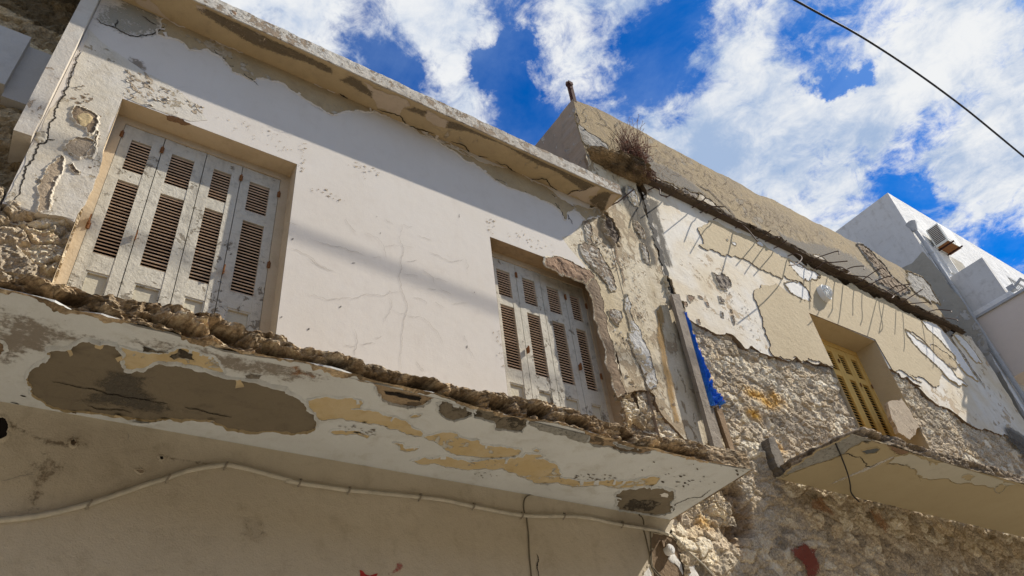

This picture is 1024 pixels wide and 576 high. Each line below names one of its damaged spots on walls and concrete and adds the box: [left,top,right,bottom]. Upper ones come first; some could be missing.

crack [14,51,80,200]
flaking render [35,85,101,213]
flaking render [124,0,677,417]
flaking render [784,259,821,302]
flaking render [856,242,941,306]
flaking render [0,272,754,520]
flaking render [905,320,983,387]